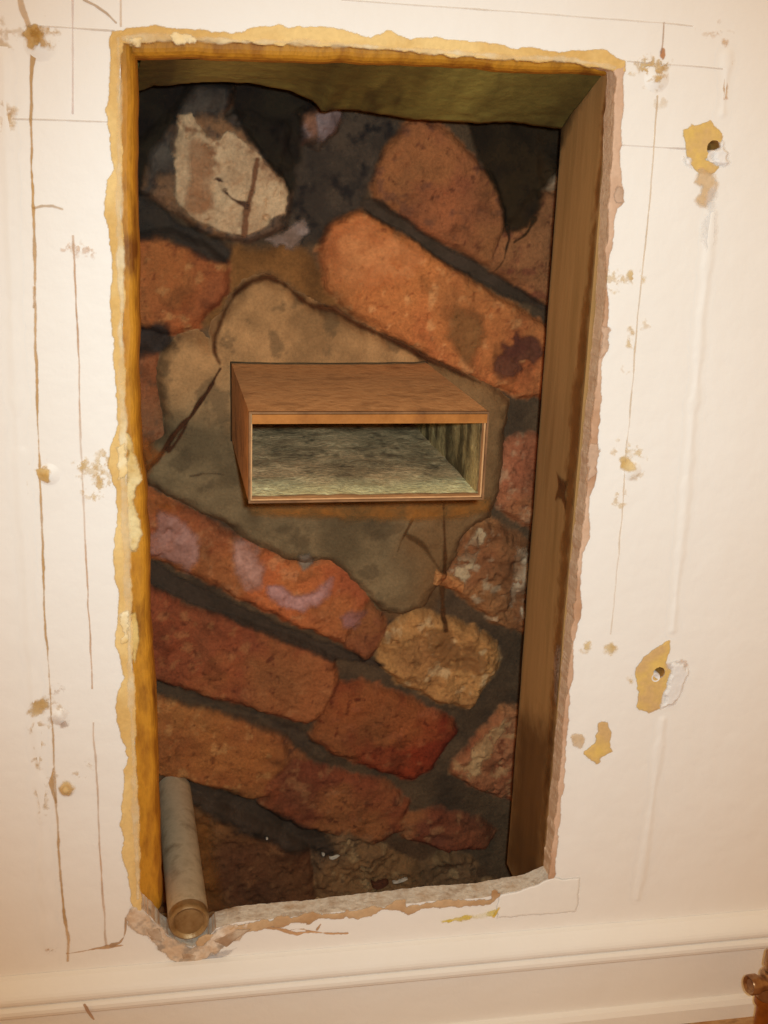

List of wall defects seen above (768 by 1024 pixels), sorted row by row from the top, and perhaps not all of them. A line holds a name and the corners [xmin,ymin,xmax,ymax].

flaking render [683,120,729,206]
crack [29,55,48,655]
crack [72,244,80,367]
peeling [104,24,626,962]
crack [85,545,93,689]
crack [402,519,448,633]
flaking render [635,640,689,713]
crack [49,689,57,803]
crack [57,832,127,954]